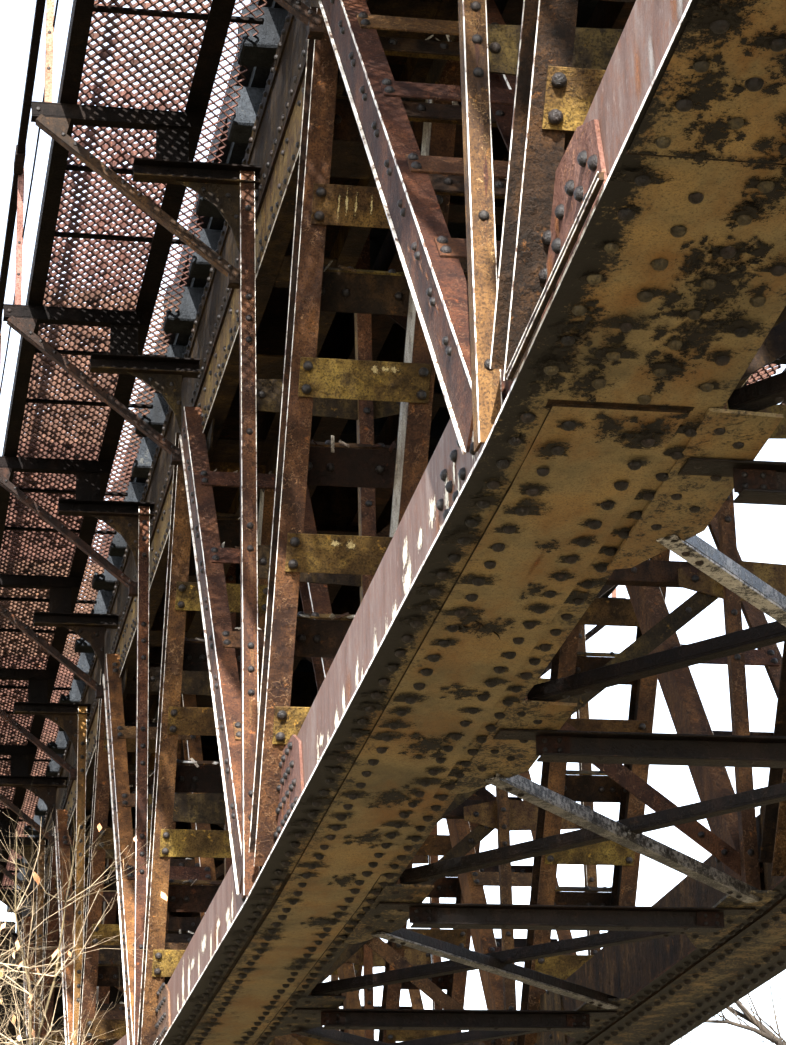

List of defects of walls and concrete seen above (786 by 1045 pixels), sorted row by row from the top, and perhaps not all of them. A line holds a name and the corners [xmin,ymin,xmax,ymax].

peeling [402,462,460,594]
peeling [397,732,460,760]
peeling [177,891,234,1012]